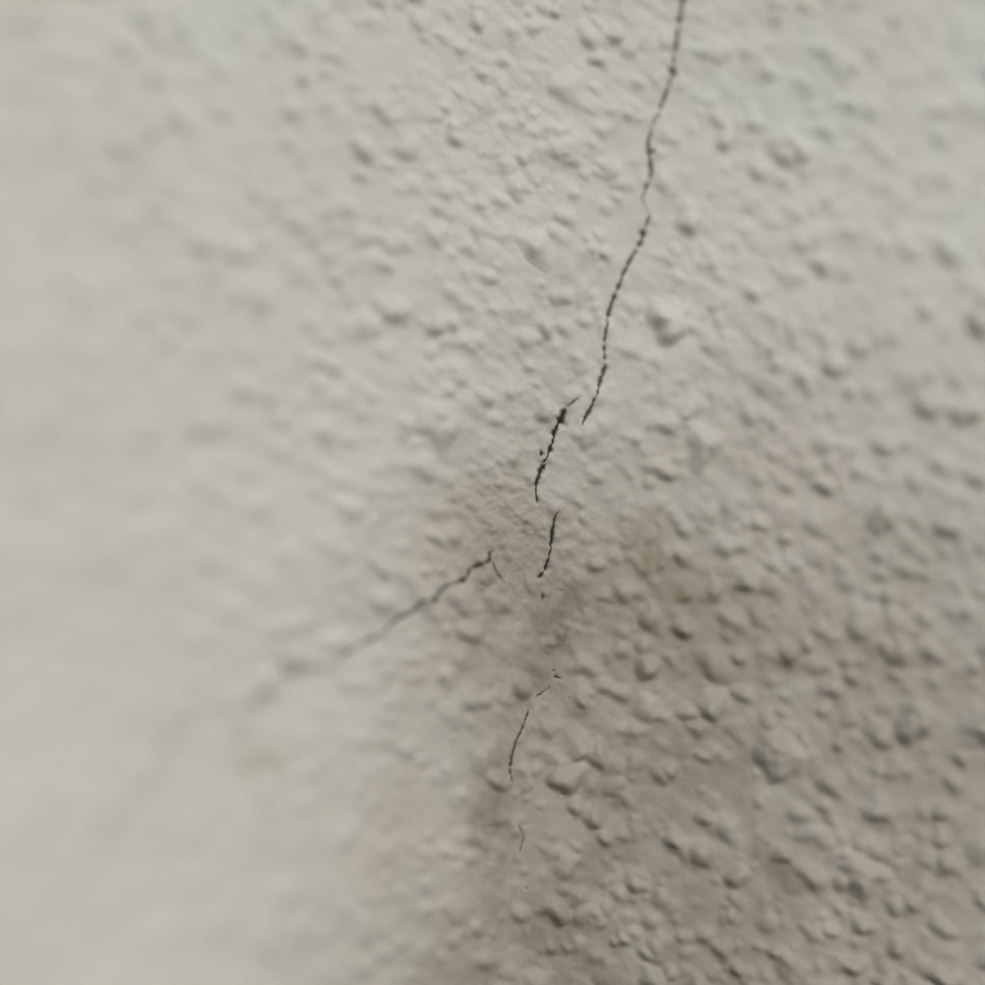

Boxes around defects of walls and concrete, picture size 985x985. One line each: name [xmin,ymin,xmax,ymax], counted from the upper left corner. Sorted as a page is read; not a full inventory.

crack [535,0,684,598]
crack [96,550,505,846]
crack [509,676,560,779]